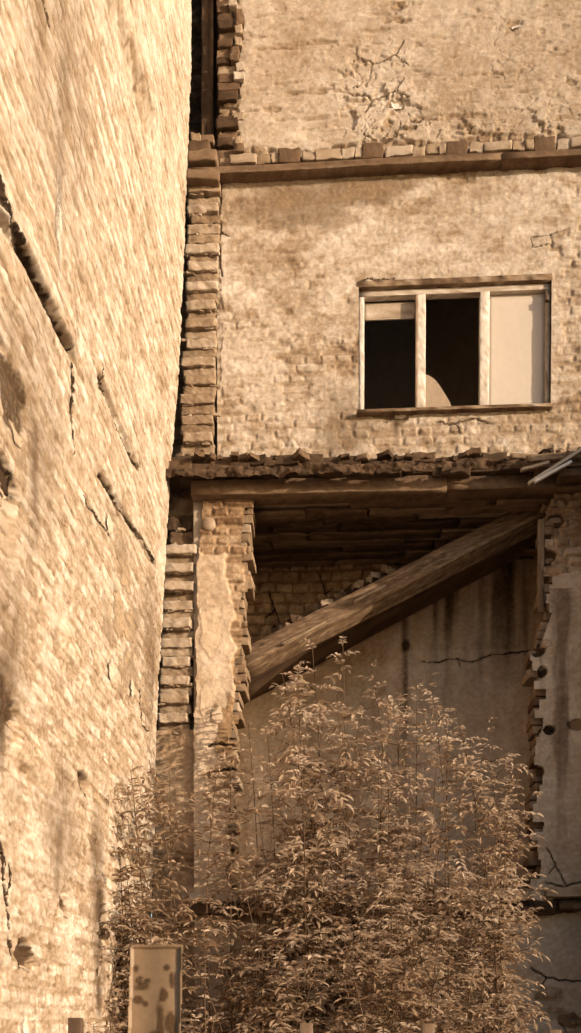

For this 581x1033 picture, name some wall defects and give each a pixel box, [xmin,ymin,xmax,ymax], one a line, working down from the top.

crack [347,42,409,144]
crack [83,475,155,564]
crack [421,650,531,667]
spalling [532,639,551,678]
crack [545,847,581,887]
crack [0,833,12,956]
spalling [13,941,34,973]
crack [531,968,581,989]